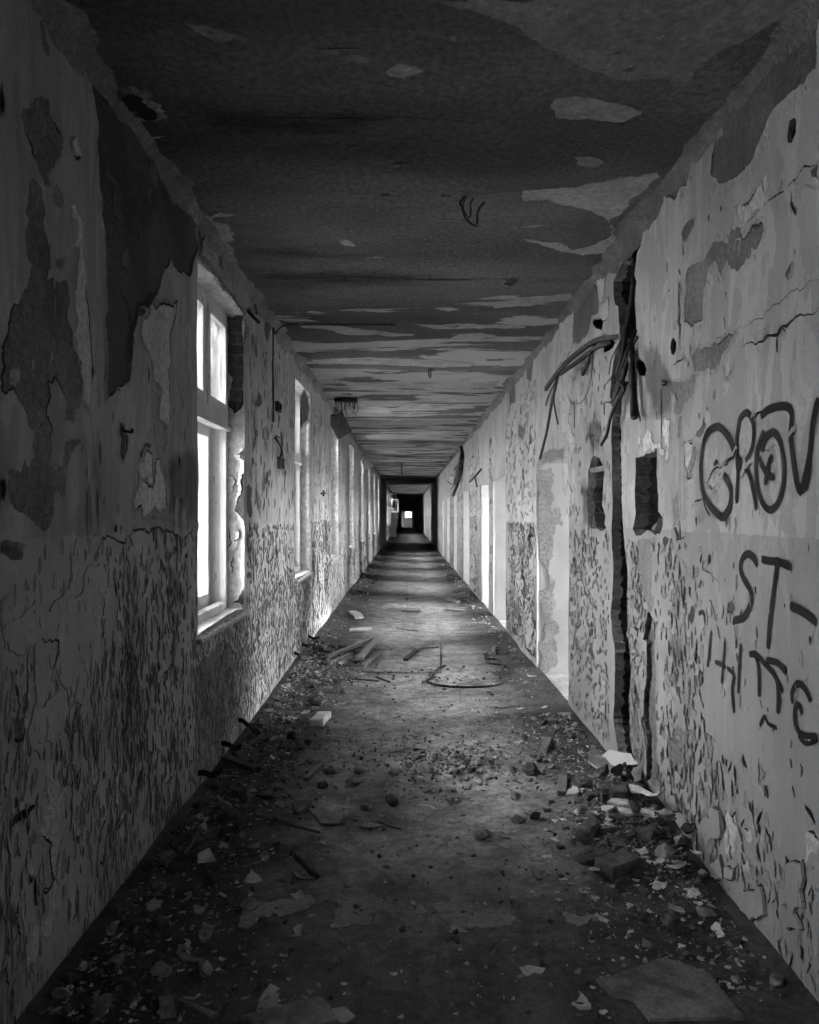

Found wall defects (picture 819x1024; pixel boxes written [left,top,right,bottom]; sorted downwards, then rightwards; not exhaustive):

peeling [0,70,525,1024]
peeling [489,276,616,742]
spalling [624,19,819,994]
crack [711,279,819,347]